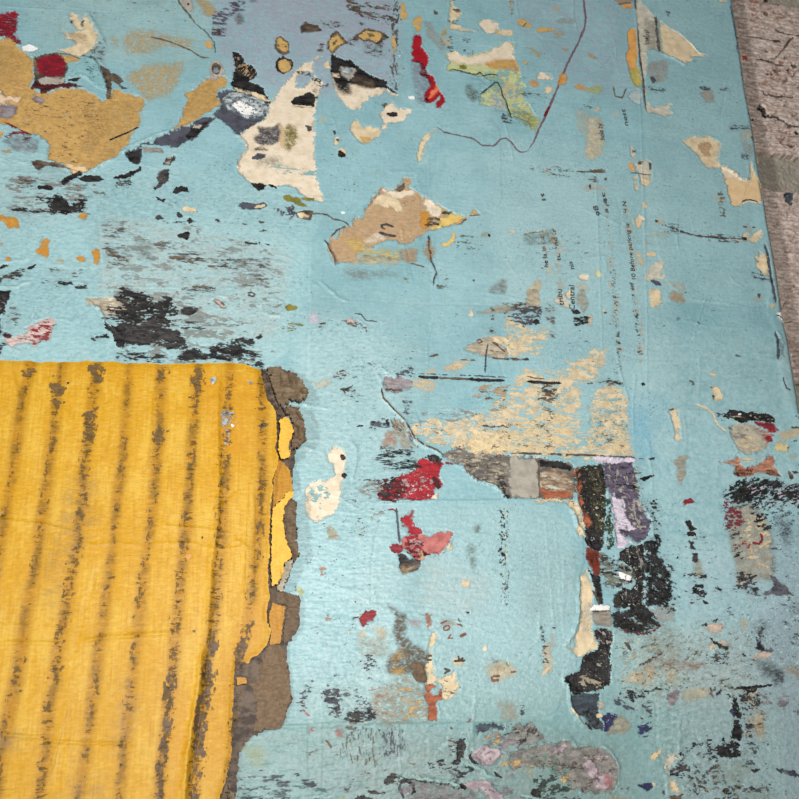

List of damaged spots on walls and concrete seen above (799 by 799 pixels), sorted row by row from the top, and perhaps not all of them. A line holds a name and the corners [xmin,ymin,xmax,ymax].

peeling [0,37,145,174]
peeling [408,0,567,108]
peeling [613,0,709,117]
peeling [699,81,728,102]
spalling [761,61,799,98]
peeling [154,155,199,240]
peeling [239,177,490,289]
peeling [682,105,769,217]
peeling [710,372,725,401]
peeling [305,280,721,735]
peeling [344,689,799,799]